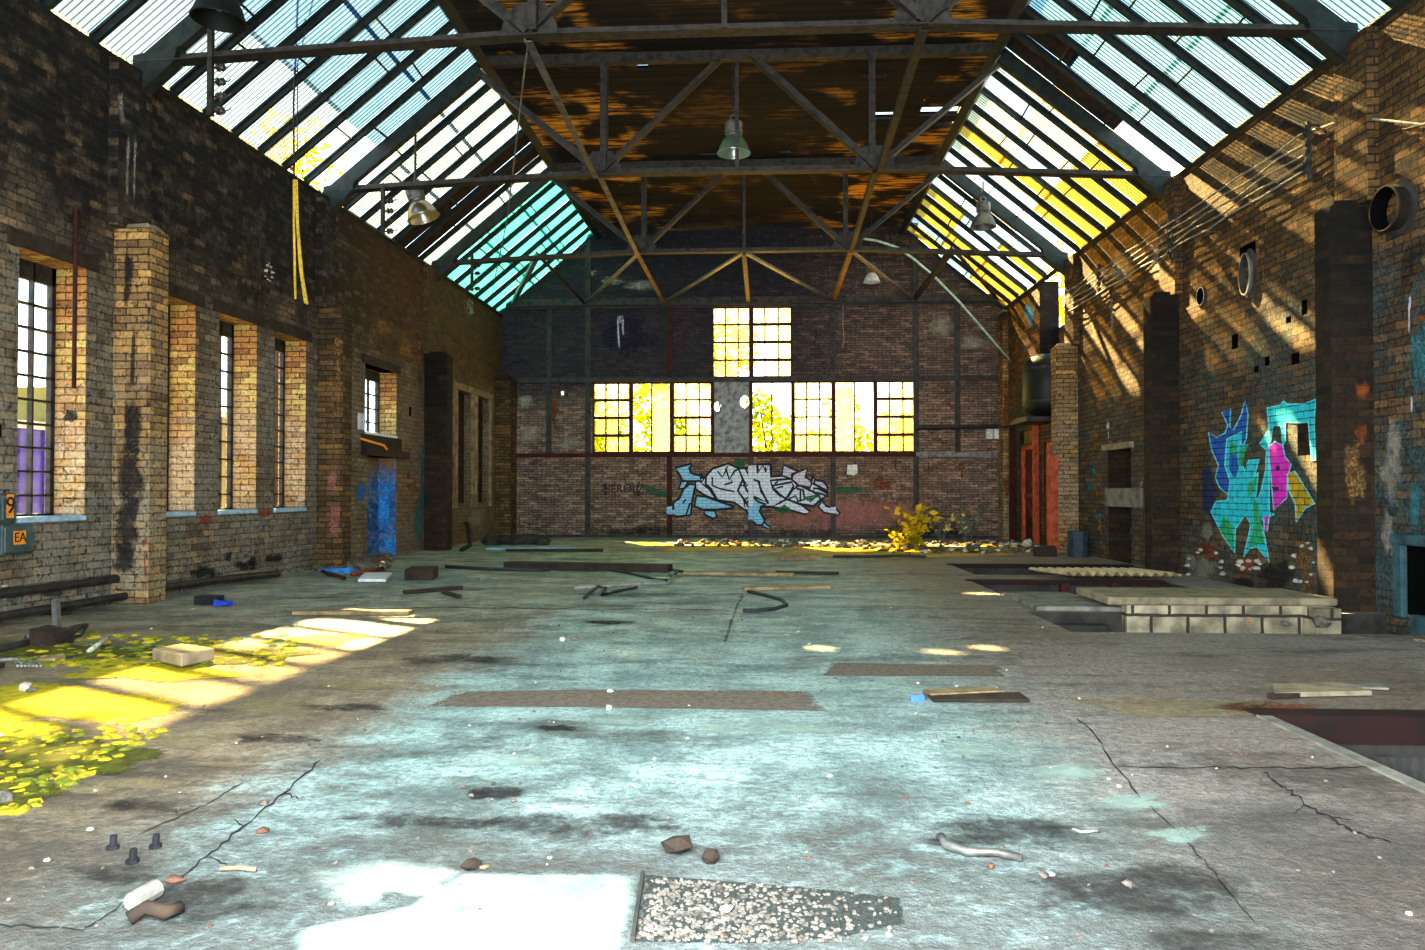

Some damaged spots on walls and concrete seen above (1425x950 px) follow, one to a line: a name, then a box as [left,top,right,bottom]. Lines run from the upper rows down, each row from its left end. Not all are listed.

leakage [124,254,133,306]
leakage [113,332,145,572]
crack [142,760,320,877]
crack [1076,717,1391,926]
crack [0,903,121,930]
spalling [624,870,905,944]